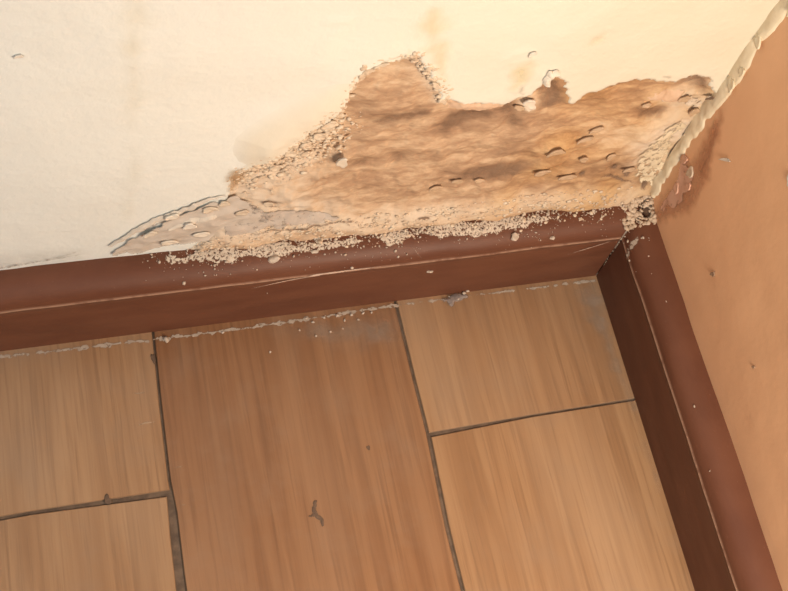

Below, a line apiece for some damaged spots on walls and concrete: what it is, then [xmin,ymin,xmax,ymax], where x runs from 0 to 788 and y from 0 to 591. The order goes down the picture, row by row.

spalling [108,51,714,256]
water stain [659,124,718,218]
water stain [166,236,361,264]
water stain [378,211,557,246]